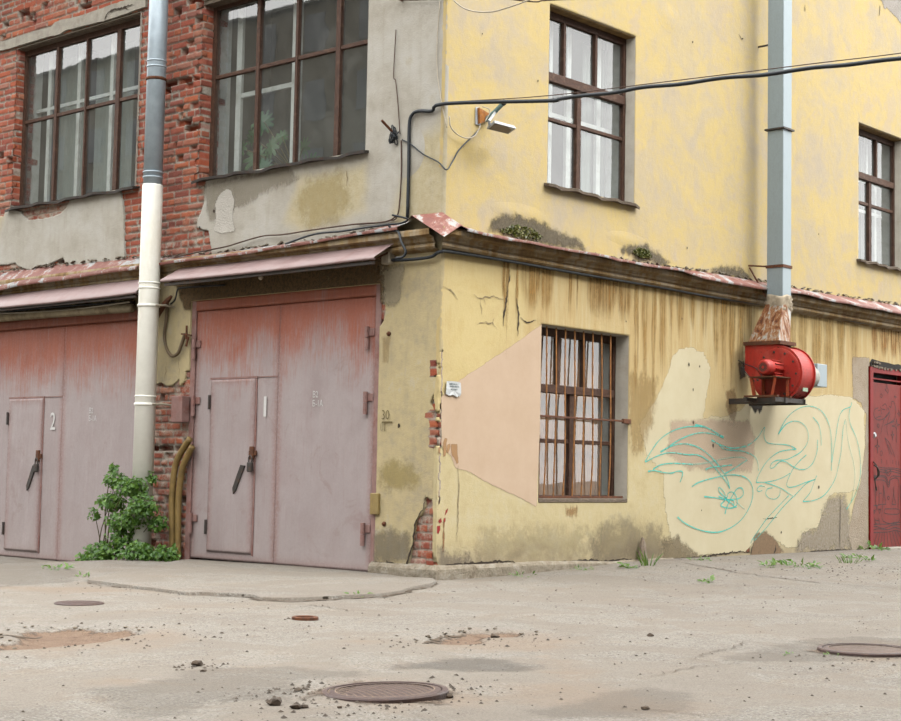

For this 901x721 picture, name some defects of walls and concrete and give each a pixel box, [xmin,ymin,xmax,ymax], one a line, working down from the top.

spalling [0,0,123,220]
spalling [122,0,149,258]
spalling [161,0,228,257]
crack [443,270,534,332]
leakage [503,263,551,308]
leakage [589,277,752,376]
leakage [790,315,856,362]
leakage [872,327,901,354]
spalling [410,352,443,565]